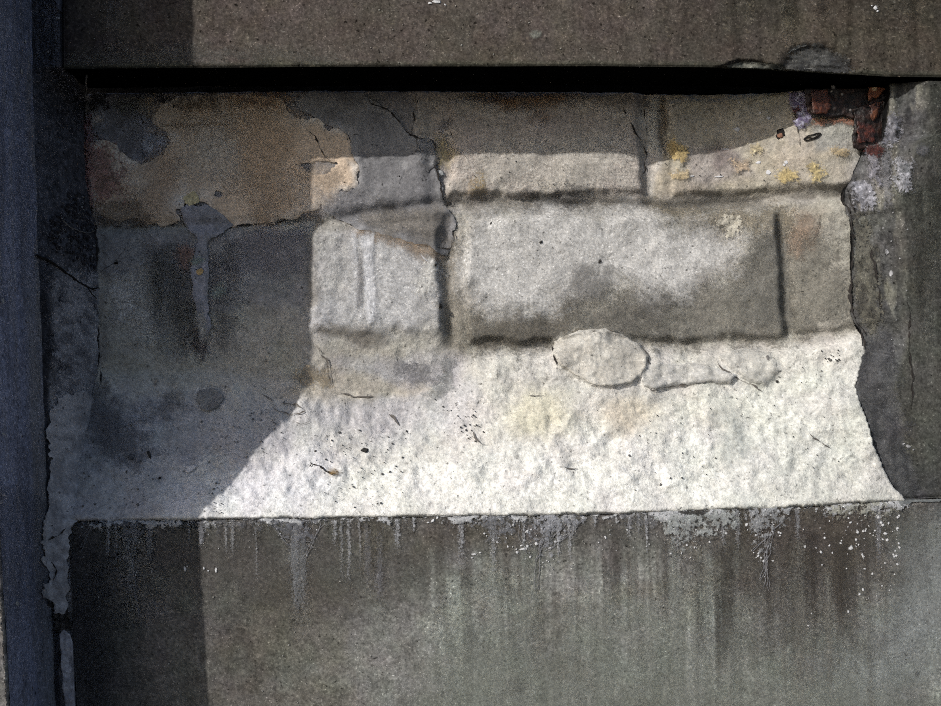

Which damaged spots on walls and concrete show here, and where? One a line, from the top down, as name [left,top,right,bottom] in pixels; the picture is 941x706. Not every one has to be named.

peeling [52,92,359,258]
crack [364,93,451,205]
crack [620,96,648,181]
spalling [715,42,860,73]
peeling [810,89,832,115]
efflorescence [850,106,928,214]
spalling [553,325,779,392]
spalling [852,211,920,497]
damp [81,519,216,606]
damp [246,501,909,604]
damp [825,539,941,697]